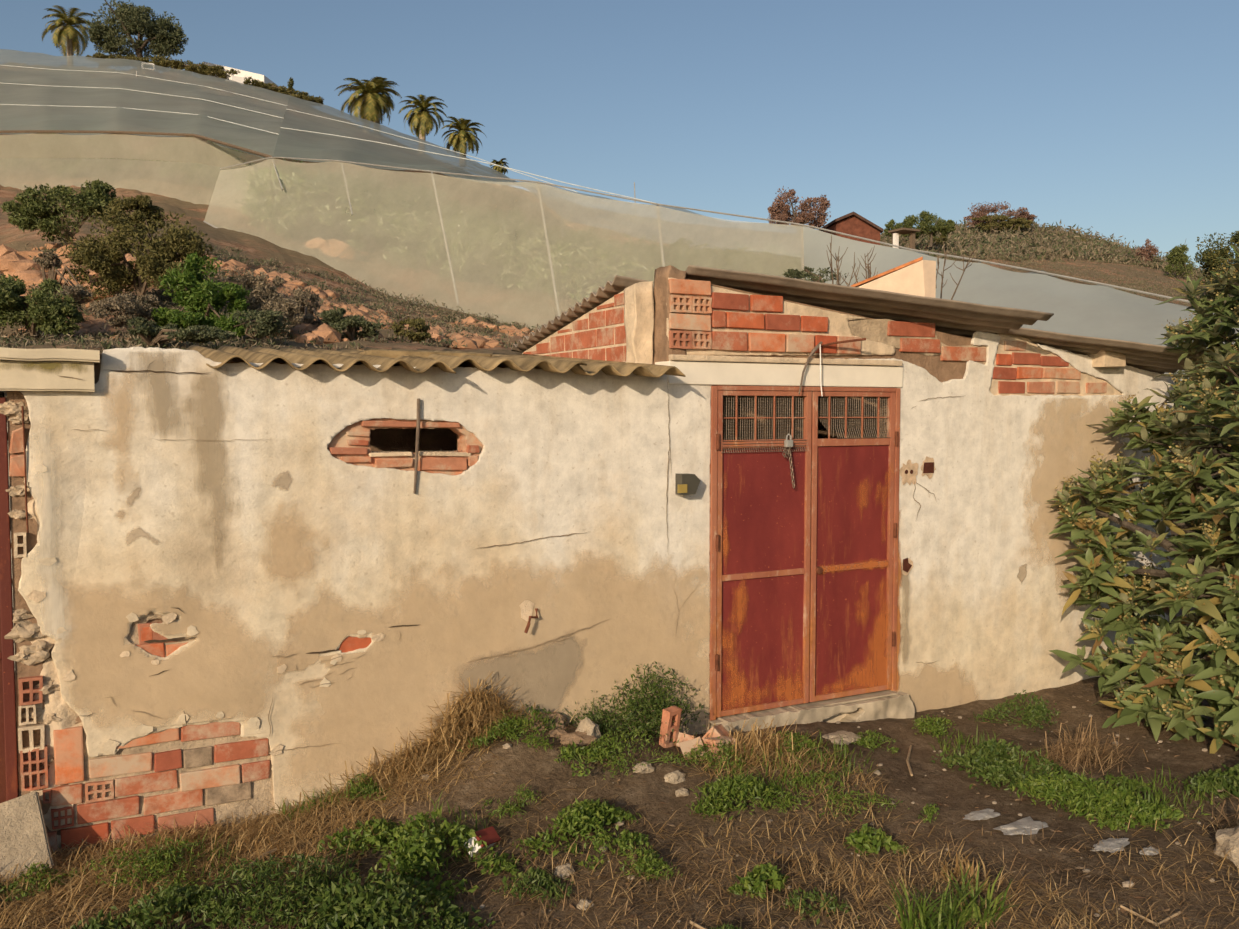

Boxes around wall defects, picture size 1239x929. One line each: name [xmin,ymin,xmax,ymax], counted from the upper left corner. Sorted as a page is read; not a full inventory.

flaking render [0,400,57,566]
leakage [139,353,179,431]
leakage [196,375,225,548]
flaking render [666,278,1122,396]
flaking render [4,590,284,852]
flaking render [330,630,385,665]
leakage [40,431,710,777]
corrosion [723,587,760,705]
corrosion [822,545,901,693]